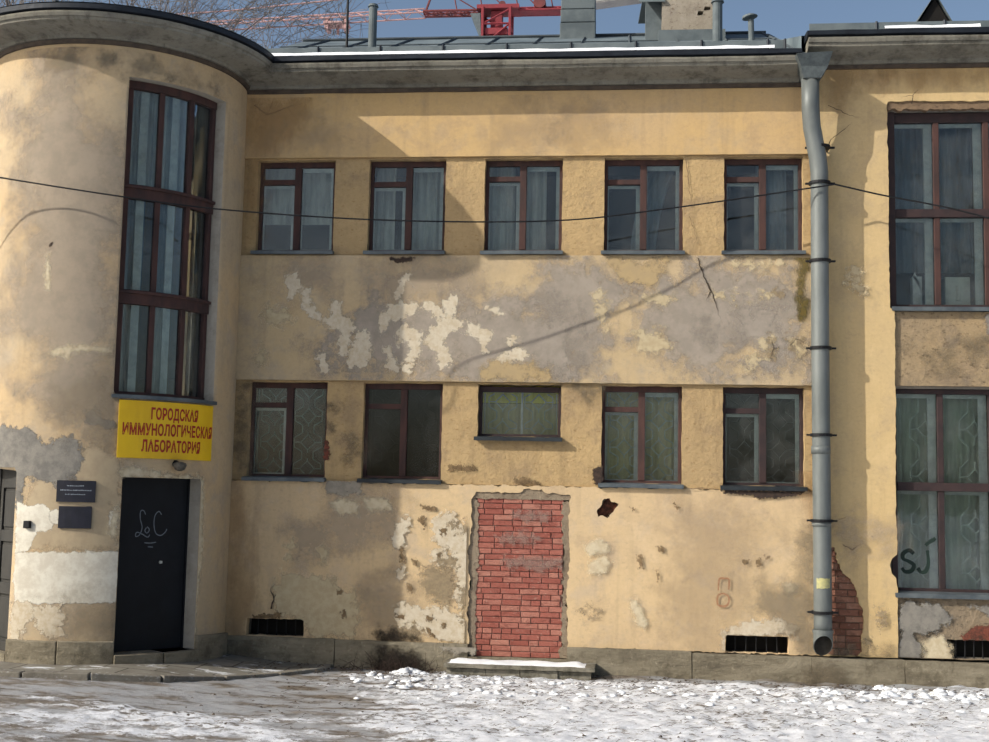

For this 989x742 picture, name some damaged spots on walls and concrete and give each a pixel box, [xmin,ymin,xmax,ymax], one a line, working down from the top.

crack [685,158,721,318]
peeling [284,256,530,375]
peeling [15,502,59,553]
peeling [108,505,119,537]
peeling [119,466,204,634]
peeling [331,497,392,515]
flaking render [597,498,618,518]
peeling [9,600,68,640]
peeling [391,504,476,656]
flaking render [828,547,888,656]
peeling [924,635,952,659]
spalling [960,605,989,641]